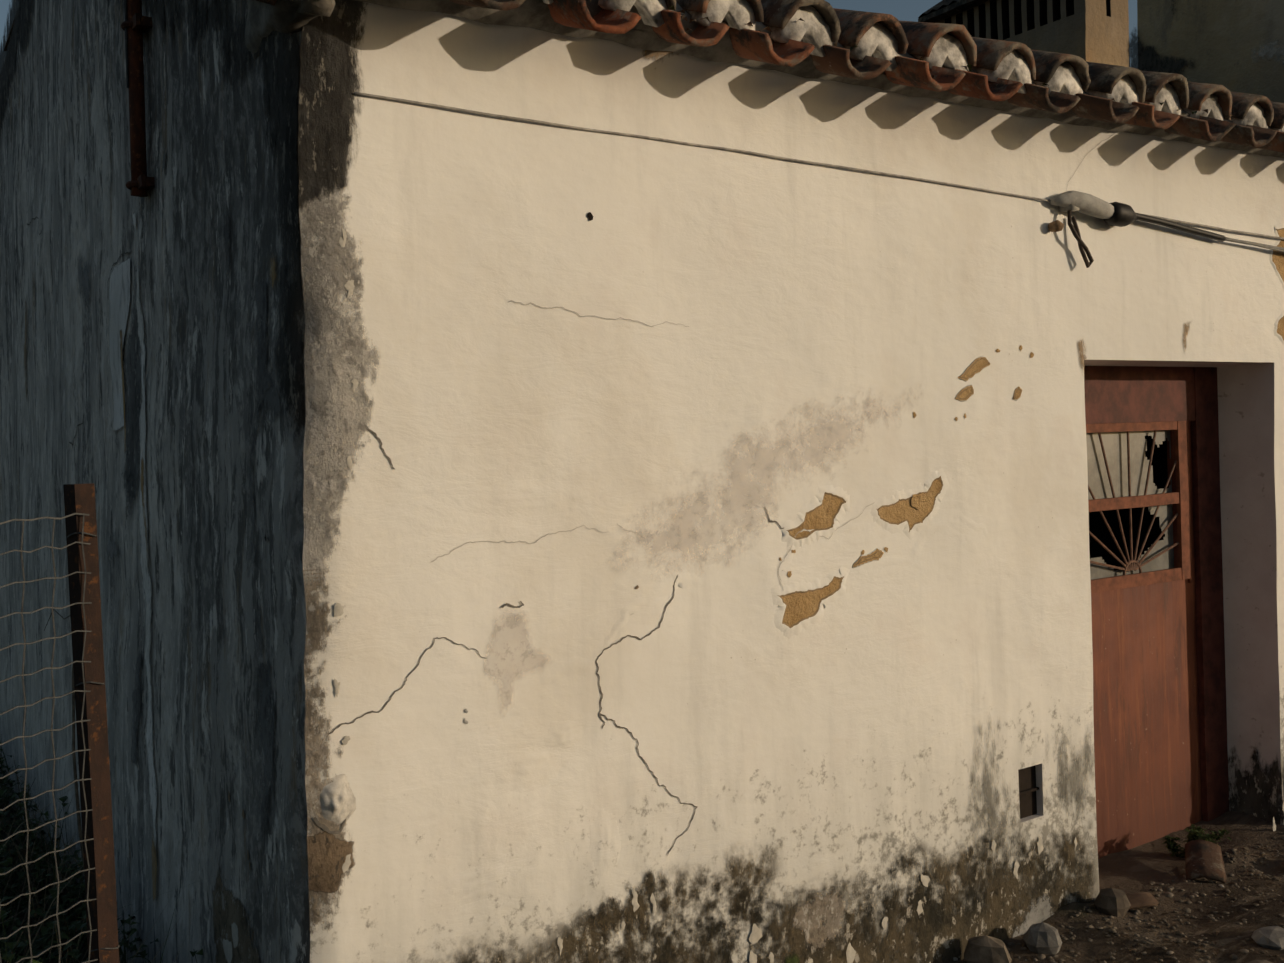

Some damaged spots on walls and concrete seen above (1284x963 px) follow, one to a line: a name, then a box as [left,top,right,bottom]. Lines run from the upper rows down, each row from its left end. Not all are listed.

leakage [0,0,33,130]
leakage [142,0,367,559]
flaking render [955,349,1000,421]
flaking render [1269,224,1284,289]
flaking render [1273,310,1284,345]
leakage [124,248,158,865]
flaking render [299,186,379,933]
flaking render [771,468,949,639]
crack [330,637,487,734]
crack [596,575,697,856]
leakage [457,729,1095,963]
leakage [1228,748,1284,831]